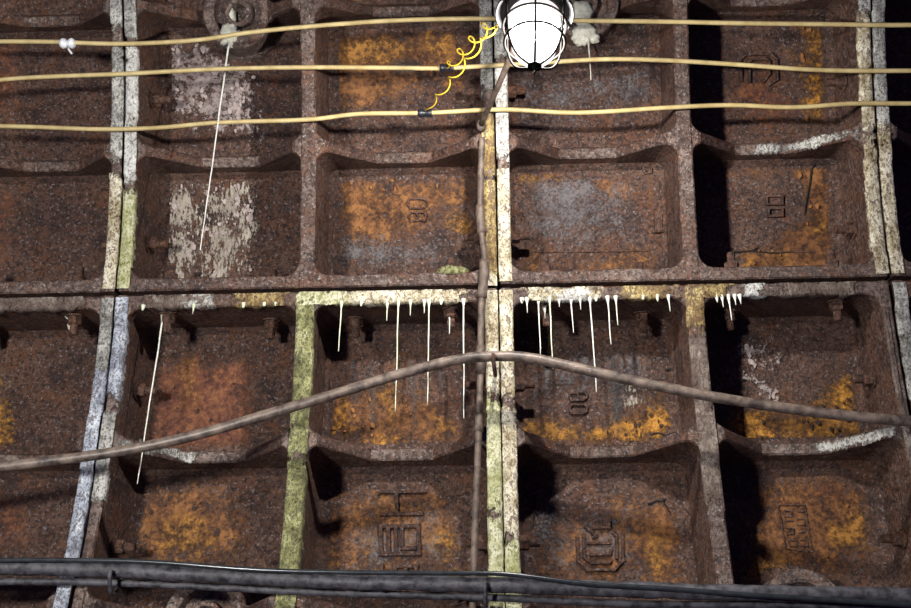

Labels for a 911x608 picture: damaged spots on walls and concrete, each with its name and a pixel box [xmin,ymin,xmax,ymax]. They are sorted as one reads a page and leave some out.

rust [339,30,467,108]
damp [215,181,246,212]
rust [341,178,469,245]
damp [479,0,604,577]
rust [155,357,251,446]
rust [332,389,460,445]
rust [524,405,671,441]
damp [618,281,858,515]
rust [730,375,858,439]
rust [140,483,245,563]
rust [747,476,869,579]
damp [488,593,522,608]